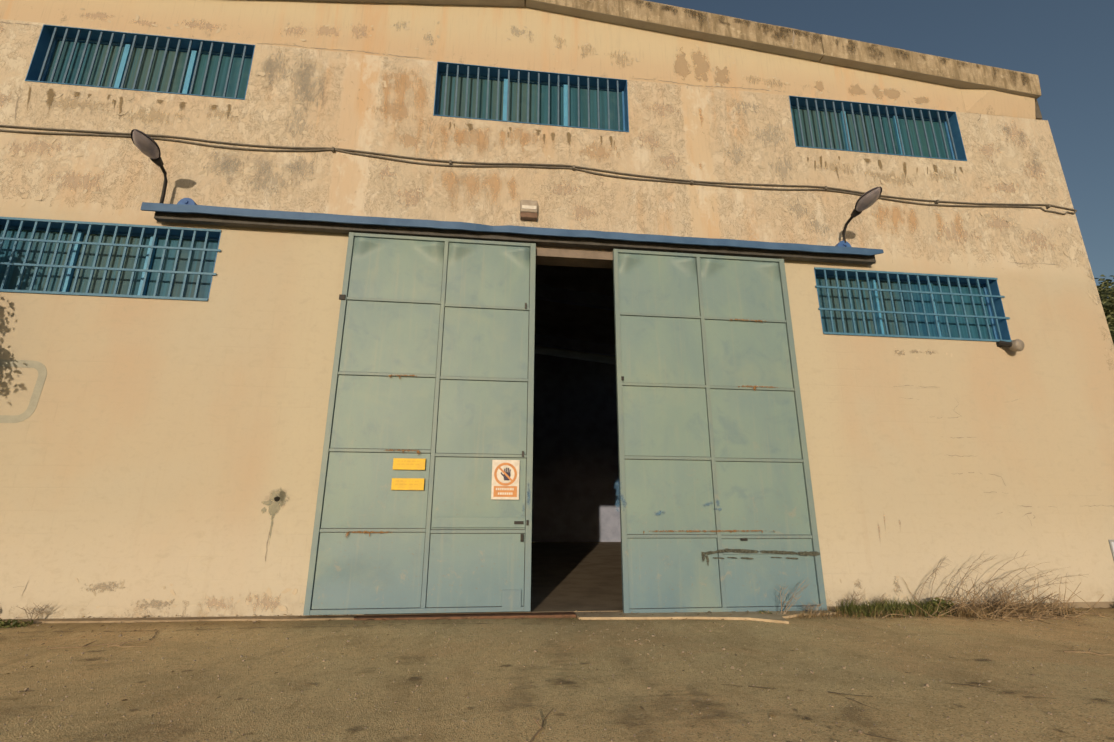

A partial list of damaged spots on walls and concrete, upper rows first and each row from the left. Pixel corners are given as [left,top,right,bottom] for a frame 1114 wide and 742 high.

peeling [675,45,736,86]